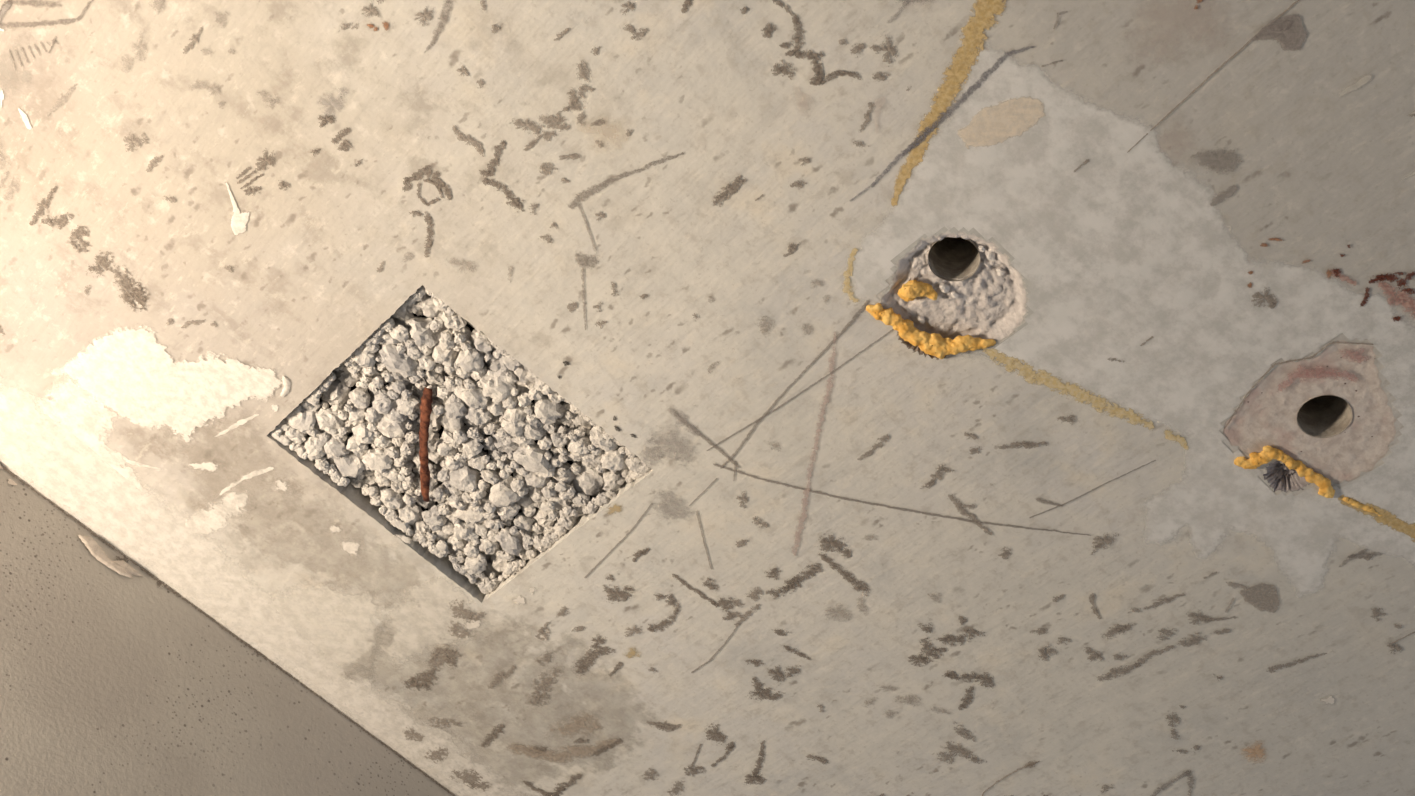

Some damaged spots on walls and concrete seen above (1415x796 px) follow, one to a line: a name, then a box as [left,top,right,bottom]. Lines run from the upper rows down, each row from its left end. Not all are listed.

crack [851,46,1034,200]
crack [1127,0,1299,153]
peeling [567,282,619,328]
rust [1326,245,1415,322]
crack [1224,342,1373,429]
rust [419,388,433,502]